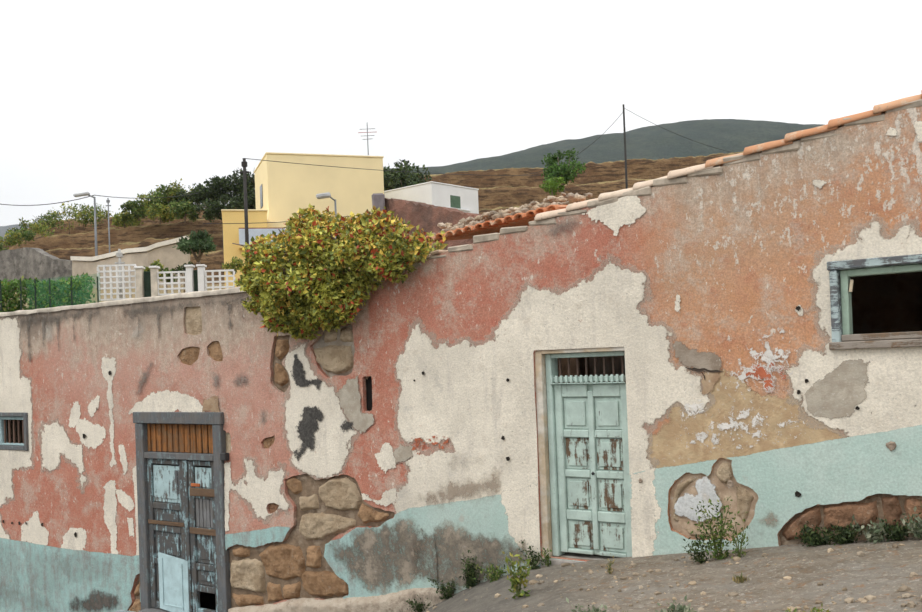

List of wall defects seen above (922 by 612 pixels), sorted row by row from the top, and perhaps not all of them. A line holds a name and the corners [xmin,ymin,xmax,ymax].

peeling [914,121,922,143]
peeling [582,195,647,236]
flaking render [179,341,223,365]
peeling [0,315,139,555]
peeling [128,390,205,414]
peeling [224,221,922,608]
leakage [335,519,527,592]